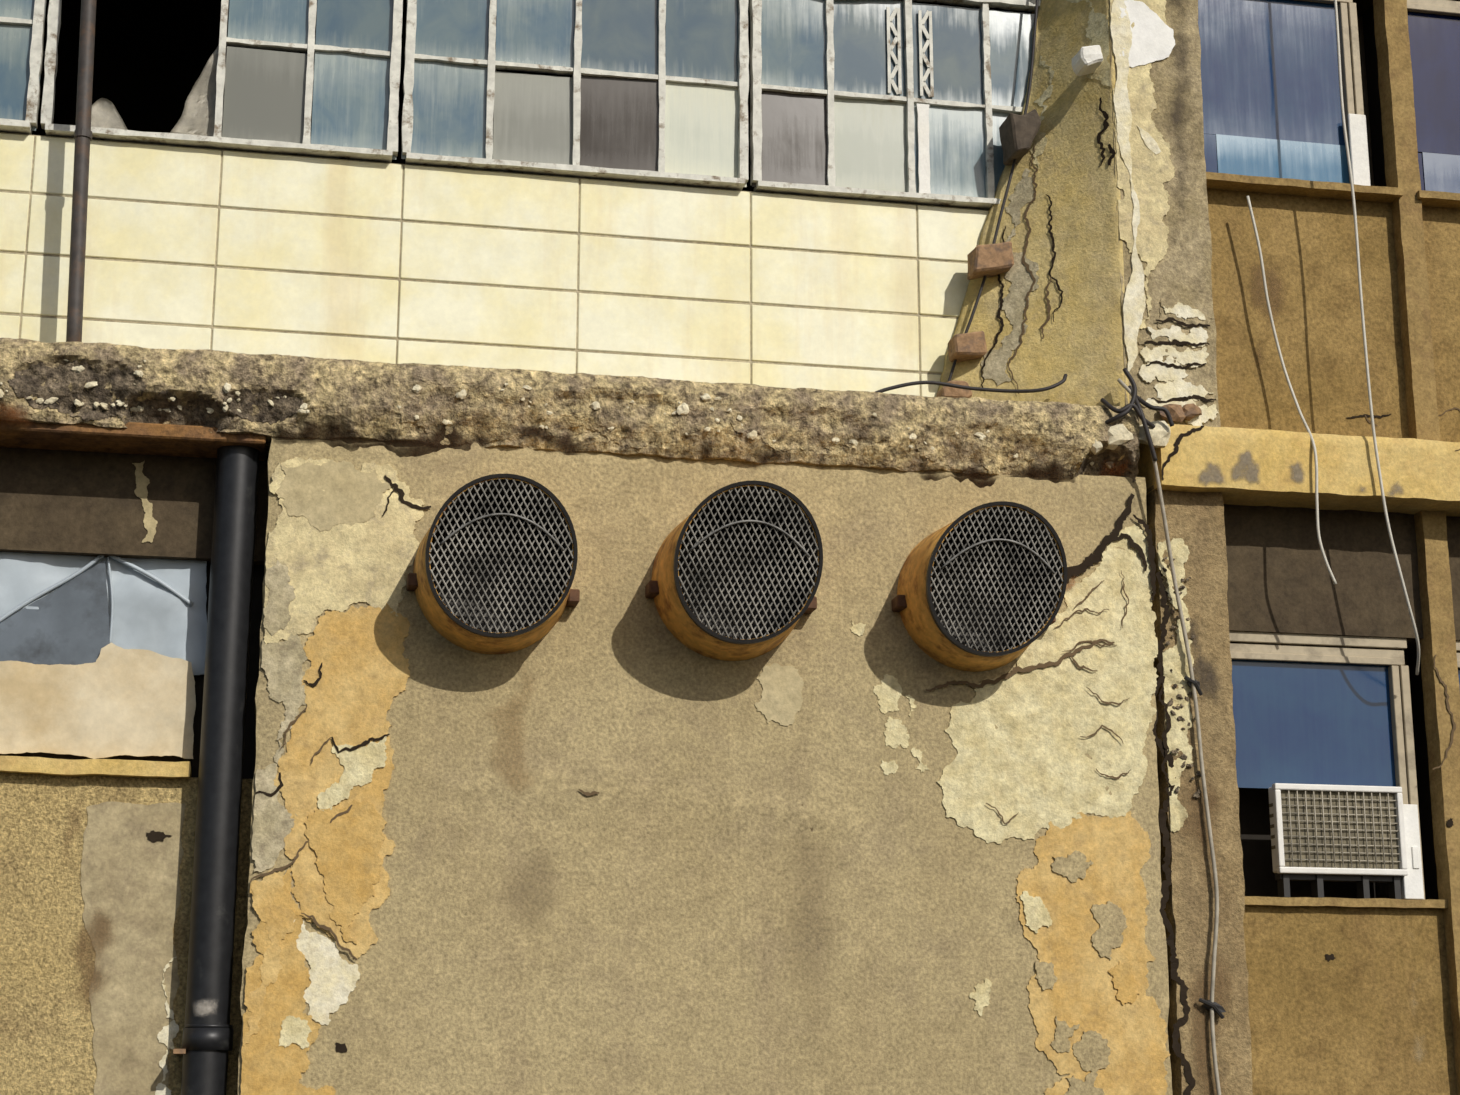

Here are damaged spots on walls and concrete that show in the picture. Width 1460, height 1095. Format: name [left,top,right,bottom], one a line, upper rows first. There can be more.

crack [981,144,1063,394]
peeling [1066,0,1218,483]
spalling [0,359,310,433]
spalling [393,383,1049,474]
peeling [132,460,158,543]
peeling [850,620,866,636]
crack [926,639,1115,692]
crack [1015,597,1034,628]
peeling [241,457,425,1095]
peeling [873,524,1201,1095]
crack [1067,426,1204,1095]
peeling [155,957,179,1095]